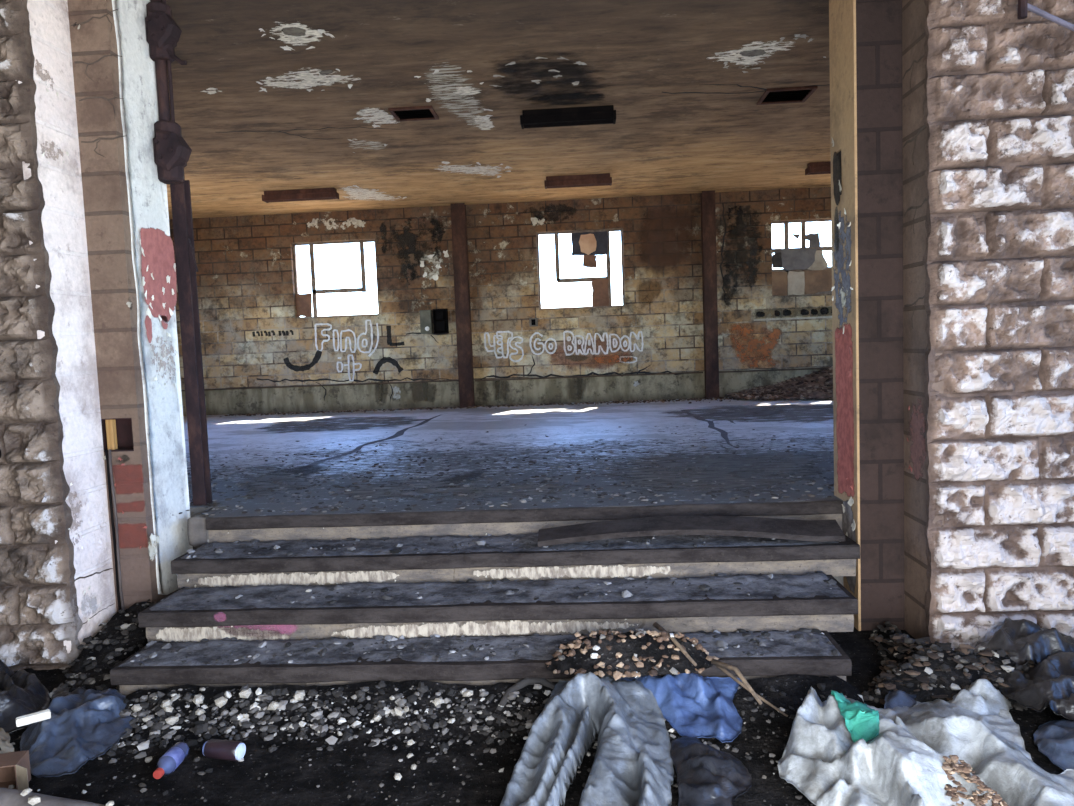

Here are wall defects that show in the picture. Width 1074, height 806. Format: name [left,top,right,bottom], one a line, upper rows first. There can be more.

peeling [259,21,335,50]
peeling [707,34,813,73]
peeling [257,68,361,92]
peeling [355,107,400,128]
peeling [414,62,516,130]
water stain [529,93,603,105]
peeling [437,161,511,178]
water stain [723,206,764,306]
crack [306,414,443,466]
crack [681,410,735,448]